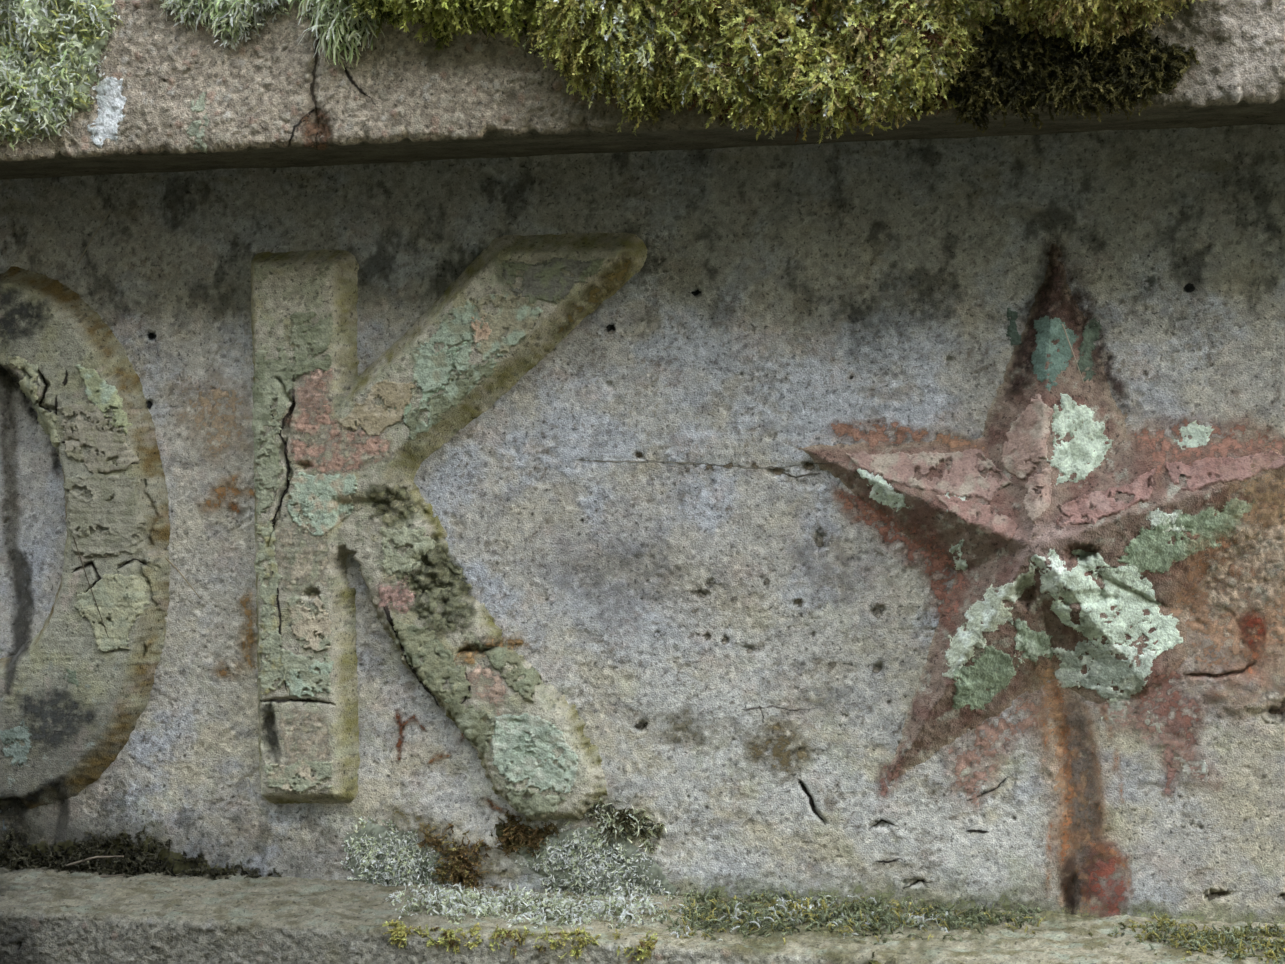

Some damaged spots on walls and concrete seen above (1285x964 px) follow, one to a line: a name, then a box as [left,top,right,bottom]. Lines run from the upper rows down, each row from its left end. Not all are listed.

leakage [0,290,46,343]
crack [38,369,68,443]
spalling [751,462,785,476]
peeling [846,394,1285,541]
leakage [0,365,94,748]
crack [72,558,157,592]
peeling [251,257,605,817]
spalling [691,582,715,613]
spalling [1198,522,1285,615]
spalling [1253,679,1285,722]
corrosion [1038,668,1131,917]